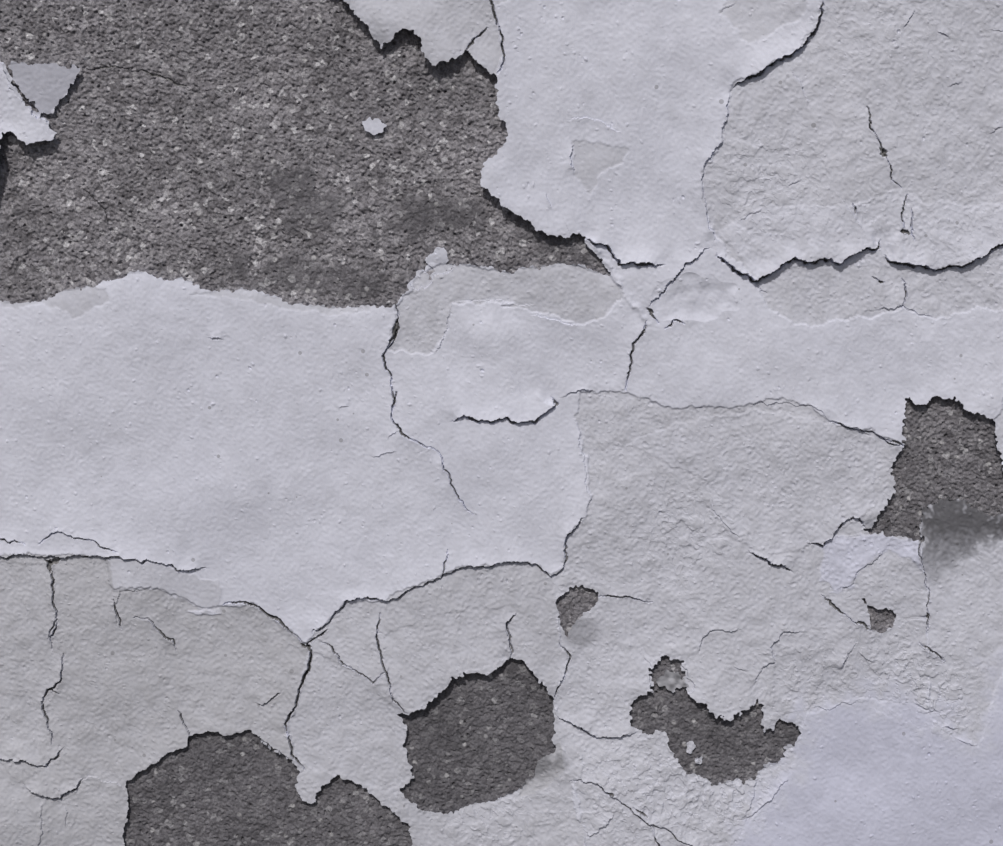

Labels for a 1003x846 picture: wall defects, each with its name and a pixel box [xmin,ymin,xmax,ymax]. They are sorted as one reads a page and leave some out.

crack [467,0,505,62]
peeling [0,0,1003,355]
crack [382,305,423,446]
crack [627,308,683,379]
crack [42,678,62,723]
crack [45,536,112,635]
crack [155,627,176,644]
crack [232,601,405,765]
peeling [0,384,1003,846]
crack [825,598,868,630]
crack [918,544,942,660]
crack [598,785,689,846]